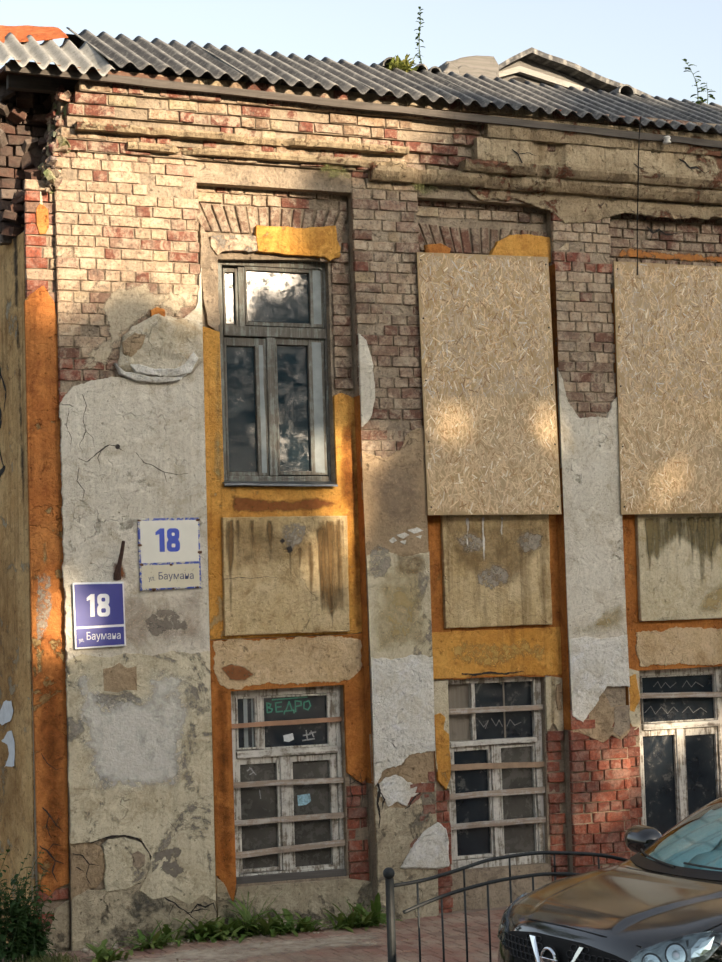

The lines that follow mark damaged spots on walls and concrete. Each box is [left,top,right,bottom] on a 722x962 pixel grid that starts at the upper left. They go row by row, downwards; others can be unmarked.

flaking render [24,151,722,461]
crack [66,394,188,497]
water stain [343,426,356,505]
water stain [226,496,334,573]
water stain [285,521,343,613]
water stain [454,517,542,589]
water stain [646,517,722,576]
flaking render [546,682,643,882]
flaking render [346,751,453,913]
crack [164,897,217,921]